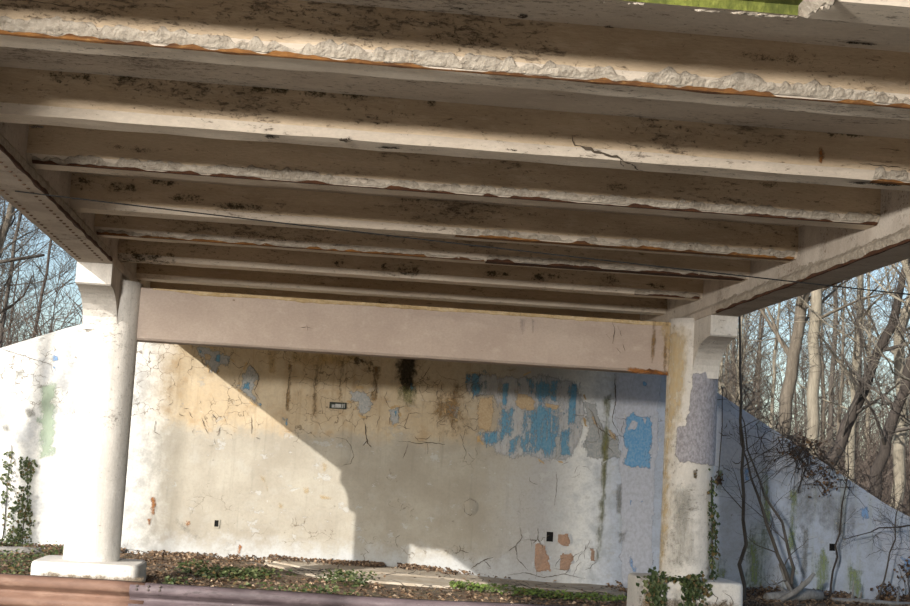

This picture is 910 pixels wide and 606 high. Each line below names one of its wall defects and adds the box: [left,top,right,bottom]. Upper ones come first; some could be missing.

spalling [685,0,836,19]
spalling [0,16,910,109]
crack [572,137,654,174]
spalling [0,133,910,313]
peeling [190,345,234,374]
peeling [237,362,261,406]
water stain [395,359,417,404]
crack [336,367,486,465]
peeling [465,371,661,469]
peeling [675,372,861,493]
crack [457,529,595,579]
spalling [532,530,575,575]